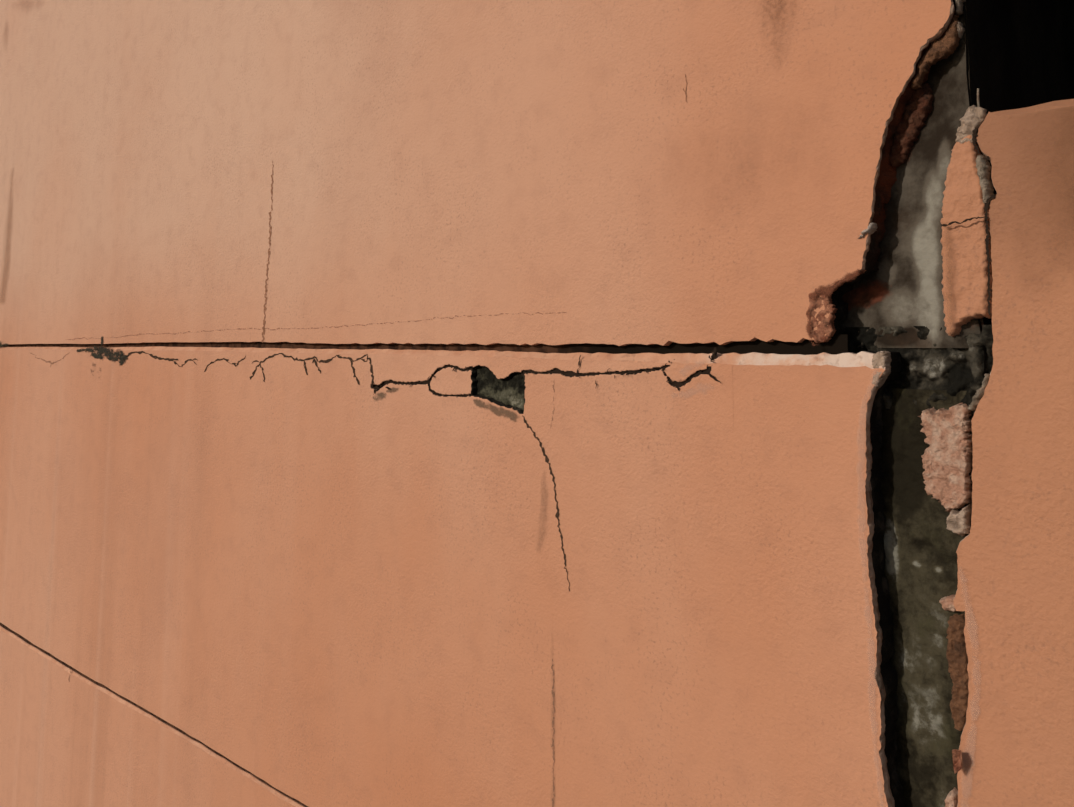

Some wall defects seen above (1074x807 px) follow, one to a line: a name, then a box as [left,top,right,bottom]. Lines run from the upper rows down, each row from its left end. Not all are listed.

crack [1,162,848,591]
spalling [476,367,526,411]
spalling [806,0,993,536]